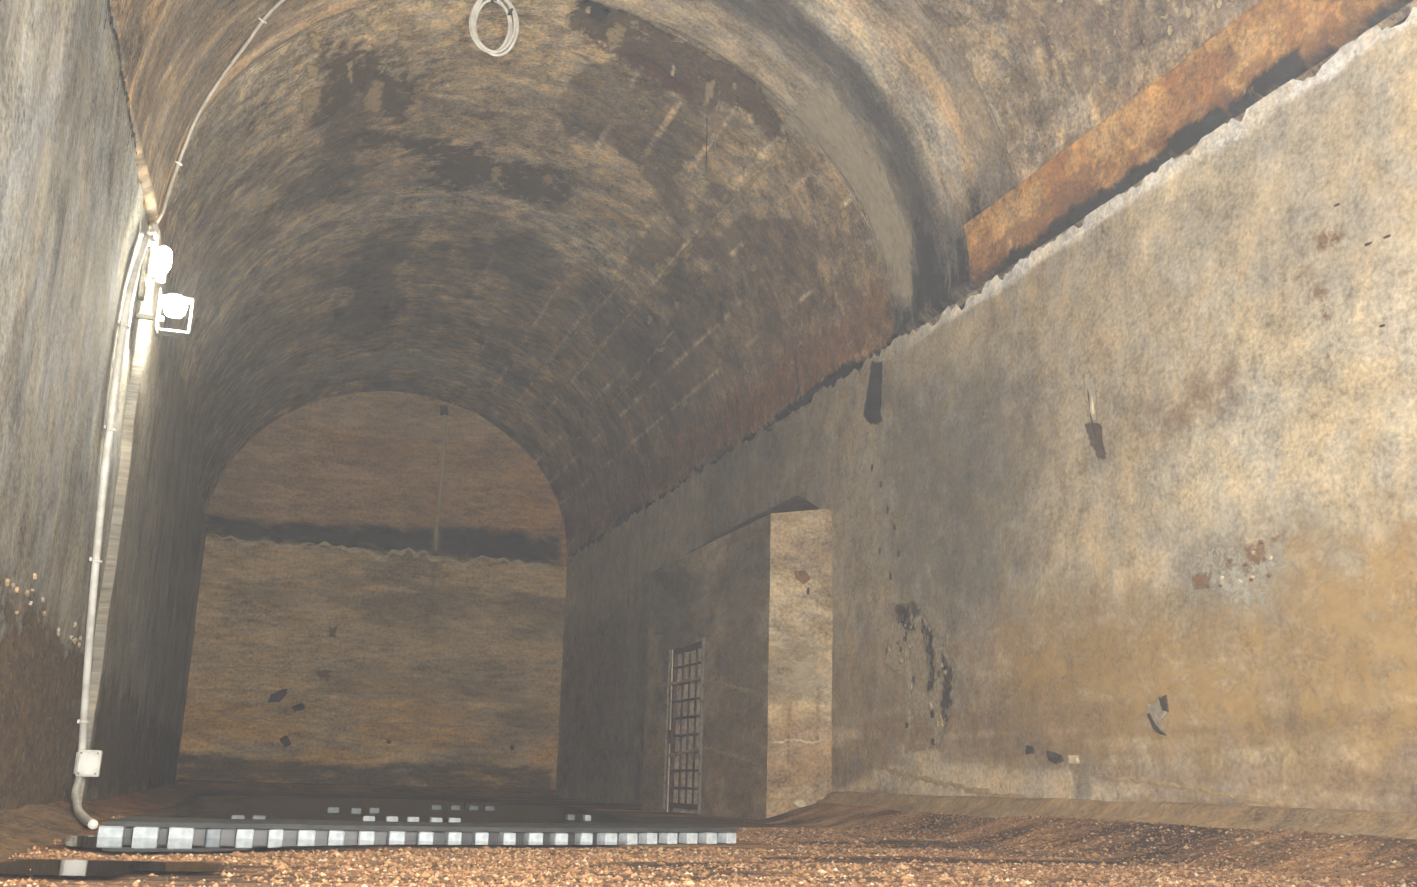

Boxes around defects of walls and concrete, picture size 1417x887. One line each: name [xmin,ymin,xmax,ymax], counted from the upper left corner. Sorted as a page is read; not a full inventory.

leakage [1358,0,1413,37]
leakage [301,32,575,209]
leakage [986,48,1338,278]
leakage [205,185,984,563]
flaking render [1084,373,1105,459]
leakage [0,573,551,810]
spalling [885,602,956,751]